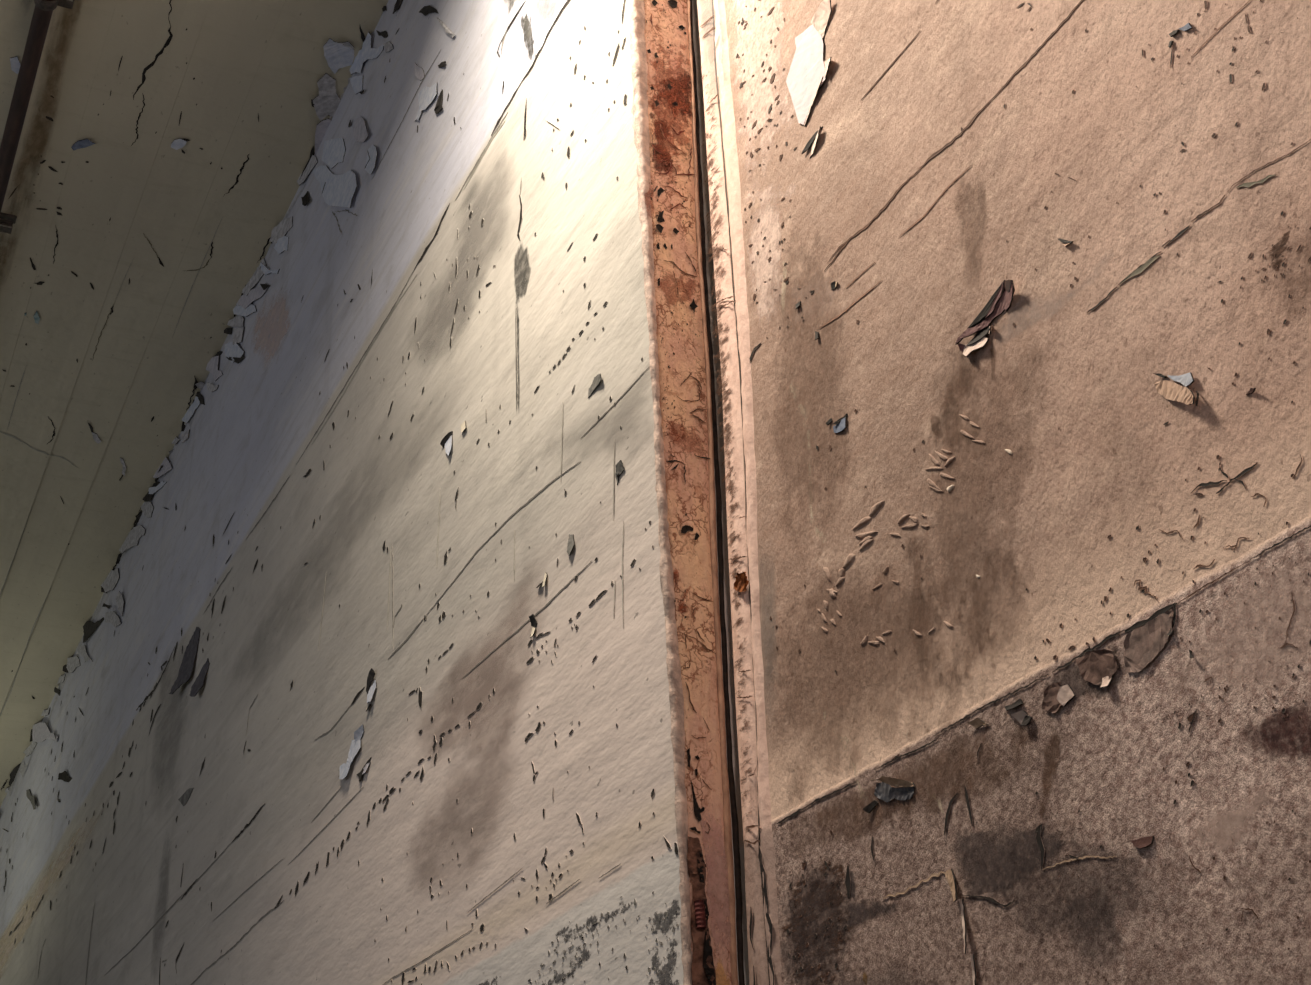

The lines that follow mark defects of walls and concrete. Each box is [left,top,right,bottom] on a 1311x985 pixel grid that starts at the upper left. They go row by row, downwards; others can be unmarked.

crack [131,0,173,146]
corrosion [650,46,693,173]
flaking render [729,0,832,172]
crack [246,0,571,539]
leakage [427,192,498,344]
leakage [515,246,530,409]
leakage [1268,231,1290,269]
peeling [2,0,403,838]
crack [136,647,175,734]
spalling [289,643,495,897]
leakage [1245,707,1311,755]
spalling [528,748,716,985]